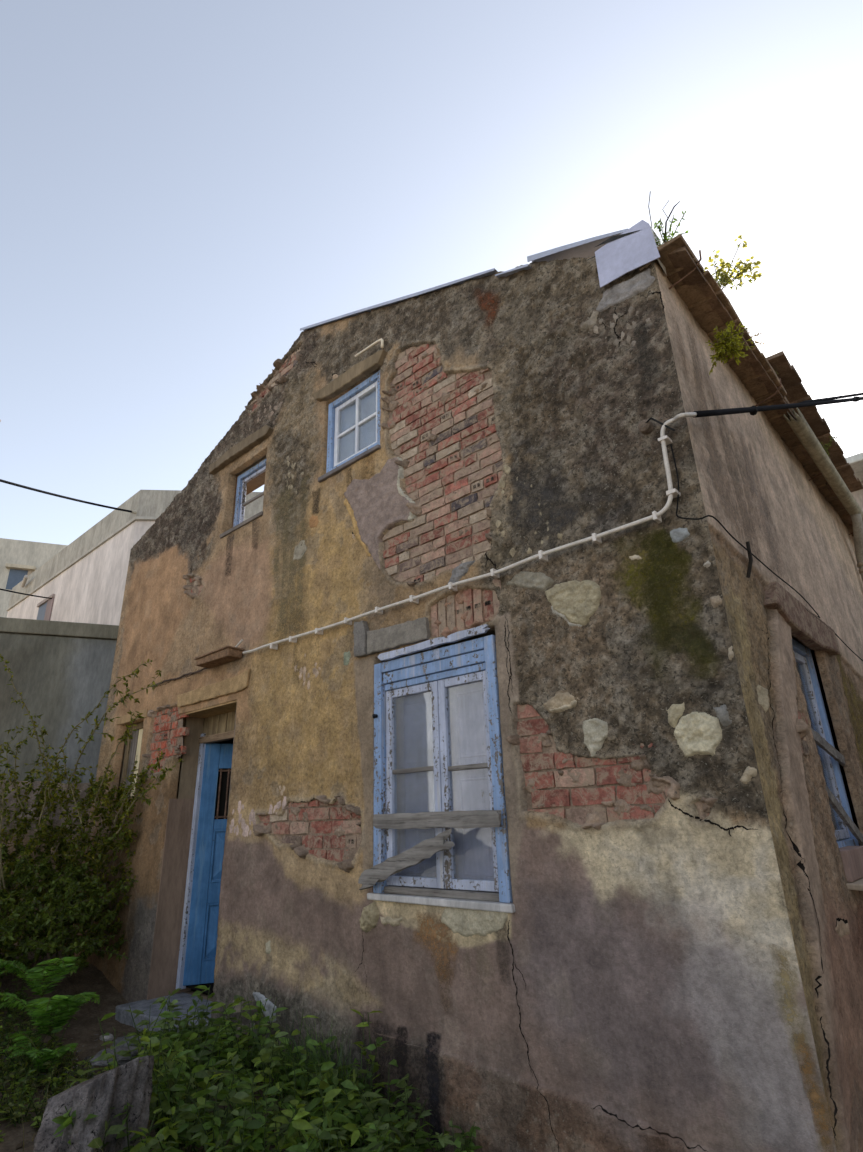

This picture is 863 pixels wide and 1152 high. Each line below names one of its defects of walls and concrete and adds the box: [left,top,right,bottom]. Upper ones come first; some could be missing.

flaking render [381,344,563,587]
flaking render [430,578,501,638]
flaking render [141,704,190,775]
flaking render [229,786,362,873]
flaking render [505,704,680,830]
crack [668,799,838,1141]
crack [507,920,559,1152]
crack [593,1105,708,1152]